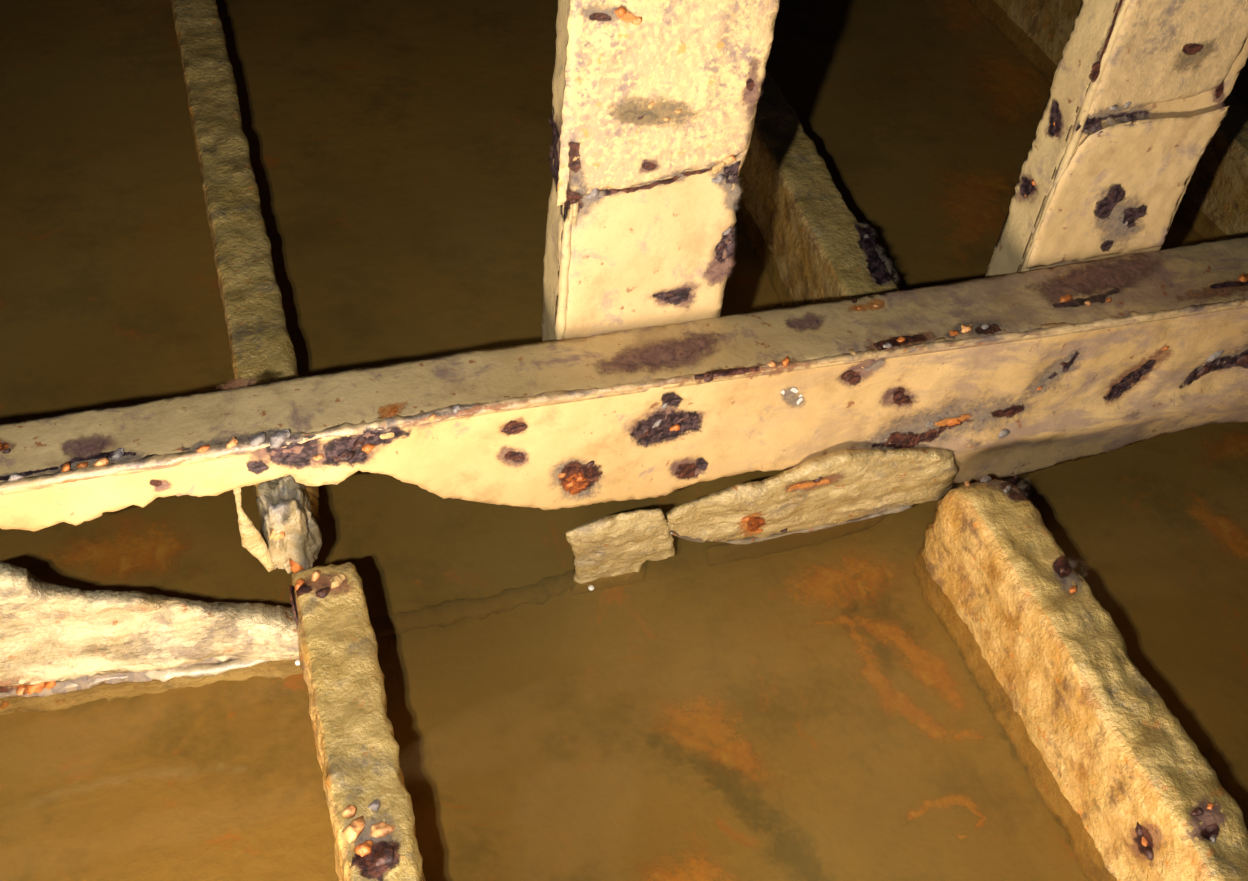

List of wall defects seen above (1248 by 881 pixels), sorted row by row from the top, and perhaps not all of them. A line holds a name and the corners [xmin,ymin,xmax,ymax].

corrosion [1048,100,1063,139]
corrosion [549,108,604,222]
corrosion [652,227,735,308]
corrosion [1030,184,1159,308]
corrosion [866,320,1002,351]
corrosion [0,436,143,482]
corrosion [184,401,525,475]
spalling [498,418,528,466]
spalling [559,461,603,493]
spalling [675,458,708,479]
corrosion [342,799,400,881]
corrosion [1131,822,1161,863]